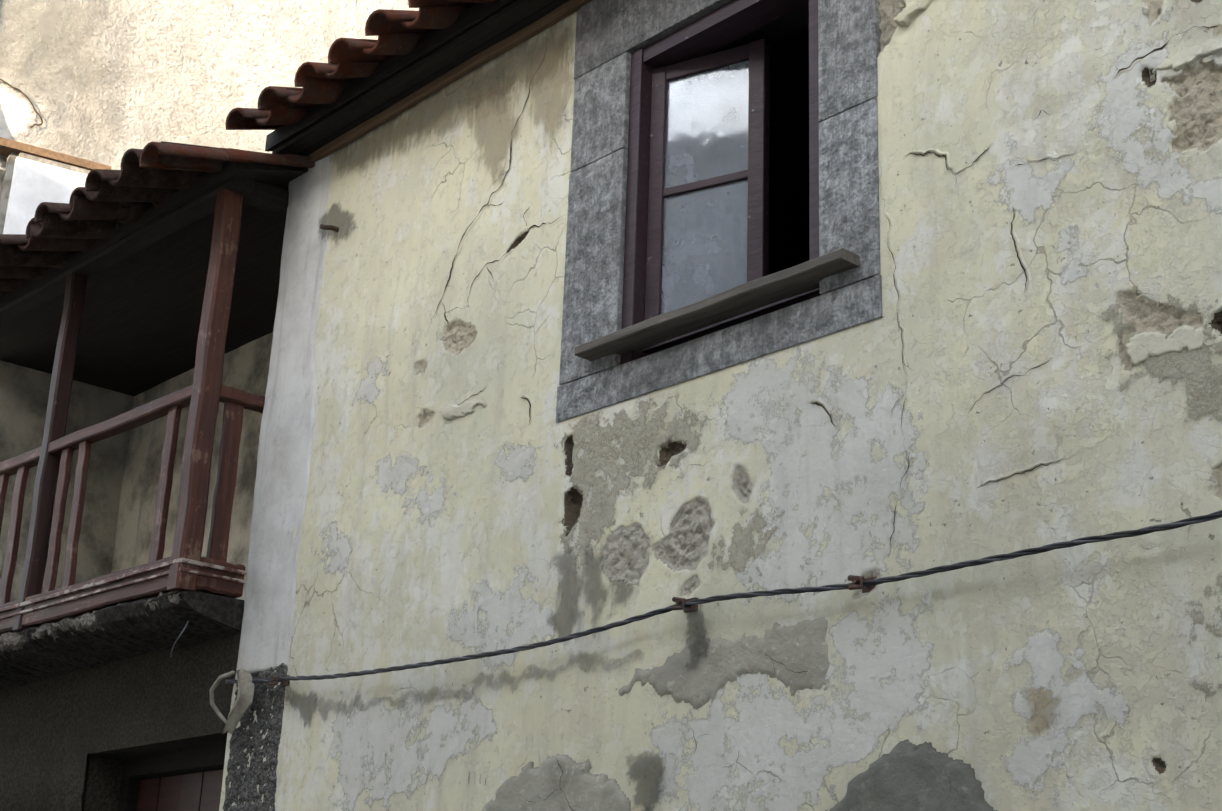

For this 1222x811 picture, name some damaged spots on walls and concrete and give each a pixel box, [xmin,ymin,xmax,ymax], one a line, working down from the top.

peeling [1086,0,1222,214]
crack [428,34,567,329]
crack [1015,150,1077,166]
crack [1010,208,1031,292]
flaking render [438,320,477,355]
crack [879,145,991,553]
crack [969,356,1051,411]
flaking render [1100,290,1222,421]
crack [978,455,1075,488]
peeling [495,347,935,811]
spalling [0,611,105,654]
flaking render [1152,758,1166,774]